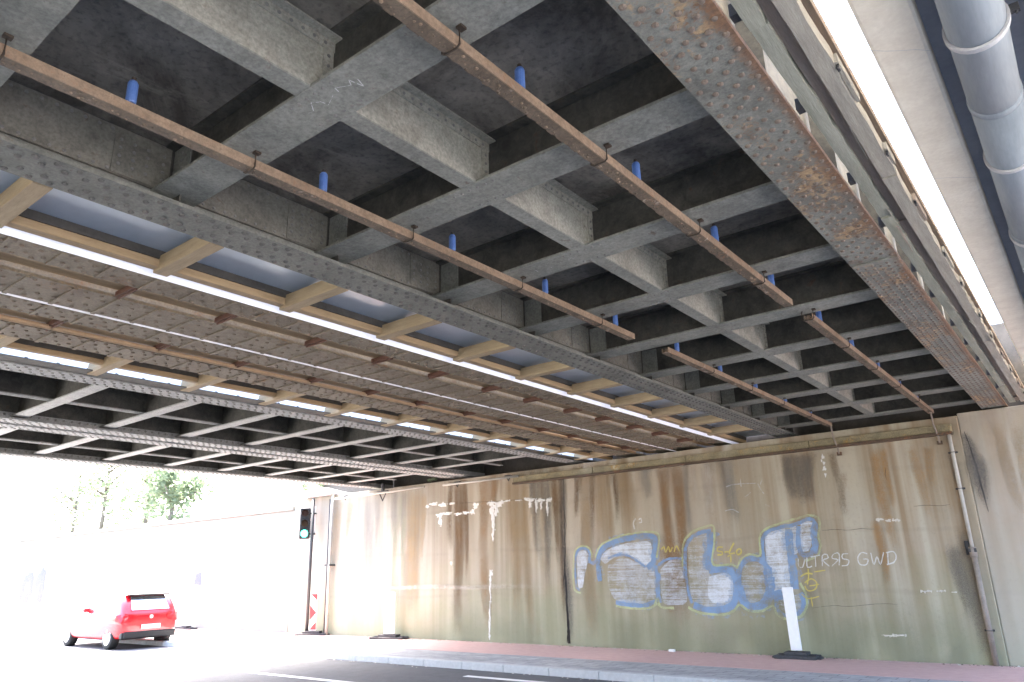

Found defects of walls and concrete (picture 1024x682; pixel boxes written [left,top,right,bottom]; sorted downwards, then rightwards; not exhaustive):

corrosion [446,471,534,637]
corrosion [549,462,620,616]
damp [781,452,847,516]
damp [865,455,993,665]